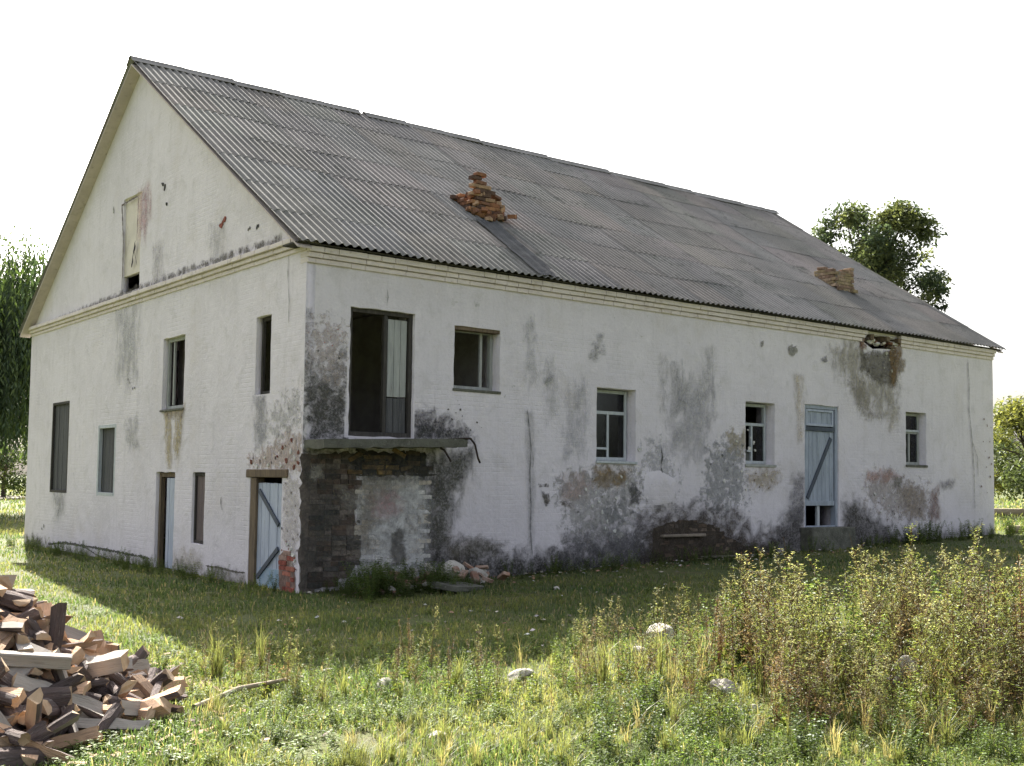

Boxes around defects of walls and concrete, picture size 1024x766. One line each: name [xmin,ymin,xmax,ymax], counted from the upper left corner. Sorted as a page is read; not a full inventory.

damp [303,351,348,453]
damp [415,404,482,438]
damp [832,341,896,418]
spalling [861,337,898,386]
flaking render [247,389,436,594]
damp [426,448,649,578]
peeling [863,466,931,524]